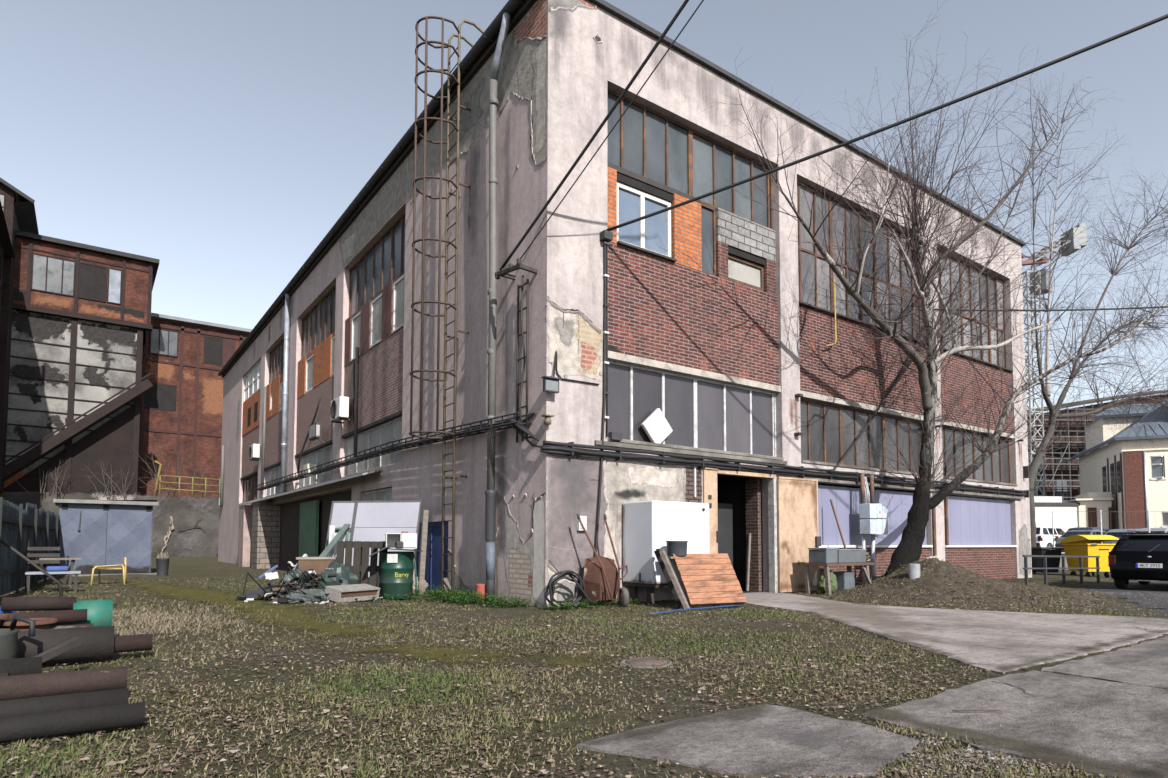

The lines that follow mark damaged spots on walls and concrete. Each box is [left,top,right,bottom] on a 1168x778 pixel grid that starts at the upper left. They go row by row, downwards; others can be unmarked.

peeling [338,0,597,266]
peeling [546,298,603,381]
peeling [495,455,592,607]
peeling [603,460,702,569]